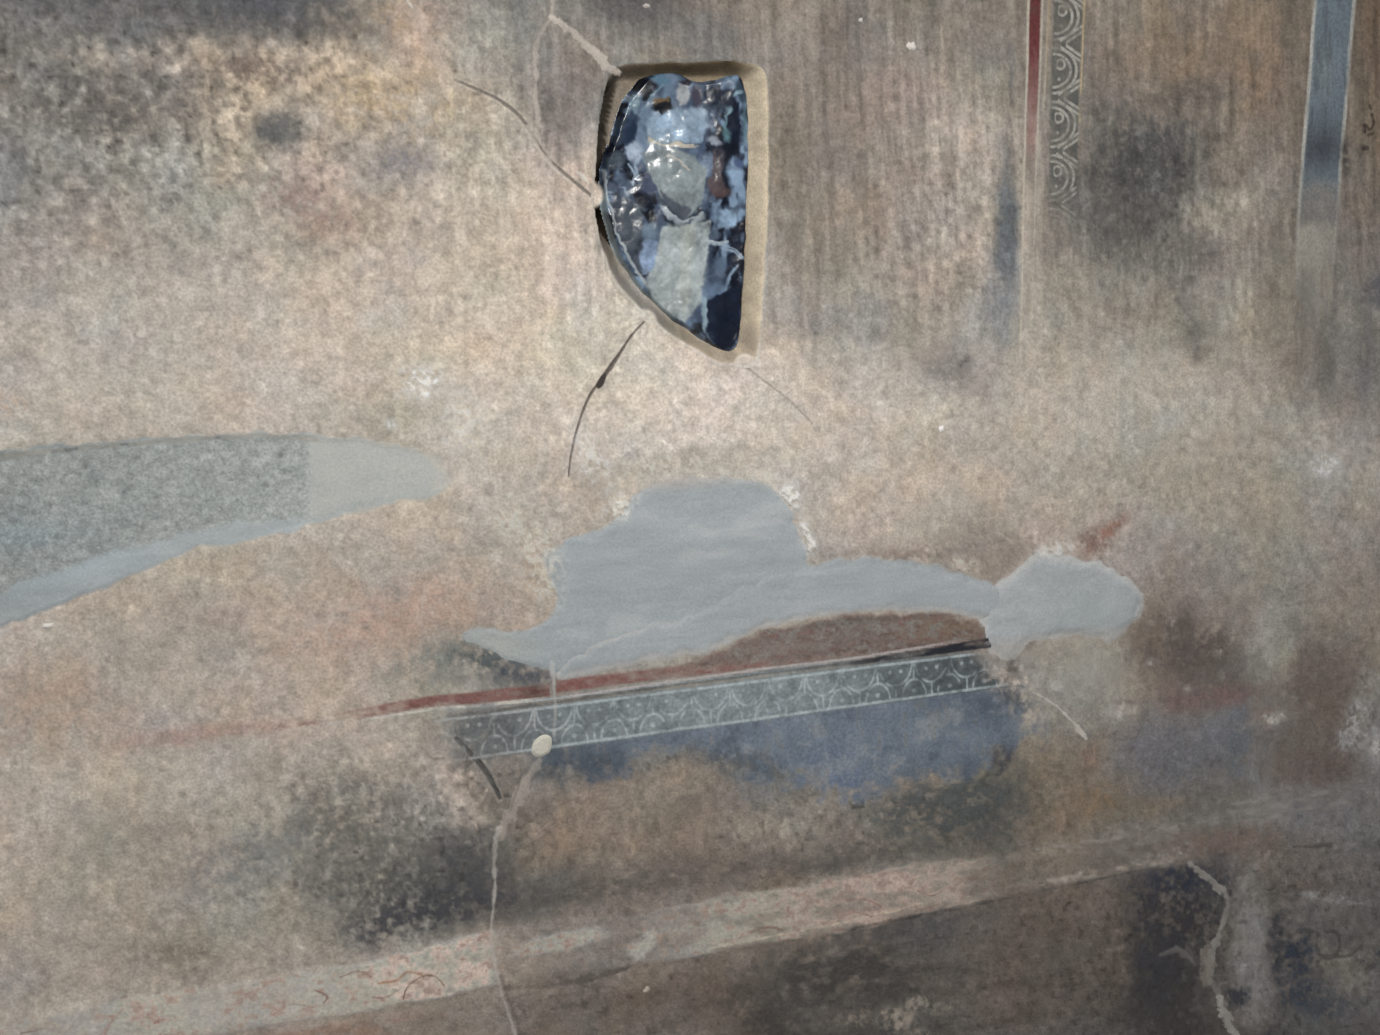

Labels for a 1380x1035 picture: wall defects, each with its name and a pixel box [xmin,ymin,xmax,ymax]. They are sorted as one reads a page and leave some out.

crack [549,15,561,25]
crack [443,68,602,207]
spalling [591,57,773,369]
crack [557,311,656,489]
flaking render [779,486,816,551]
crack [444,726,513,835]
crack [489,876,497,970]
crack [1188,862,1228,948]
crack [1217,995,1239,1035]